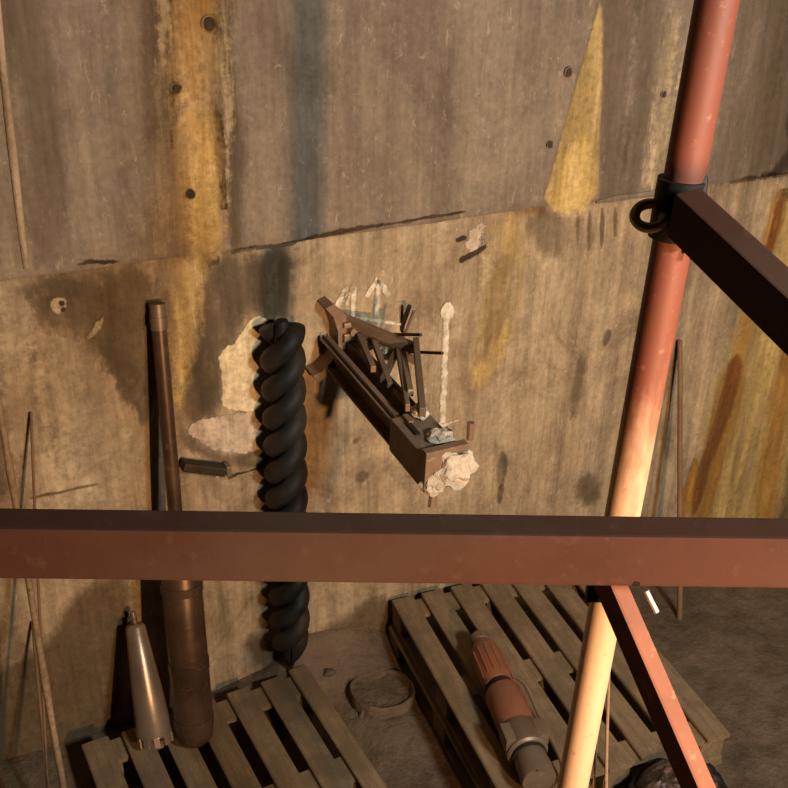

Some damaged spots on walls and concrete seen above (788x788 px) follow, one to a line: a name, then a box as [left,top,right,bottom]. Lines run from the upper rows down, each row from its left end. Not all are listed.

rust [158,0,233,327]
spalling [456,224,488,263]
rust [544,4,603,214]
rust [764,196,788,267]
water stain [15,251,290,443]
peeling [183,316,271,467]
rust [682,313,788,519]